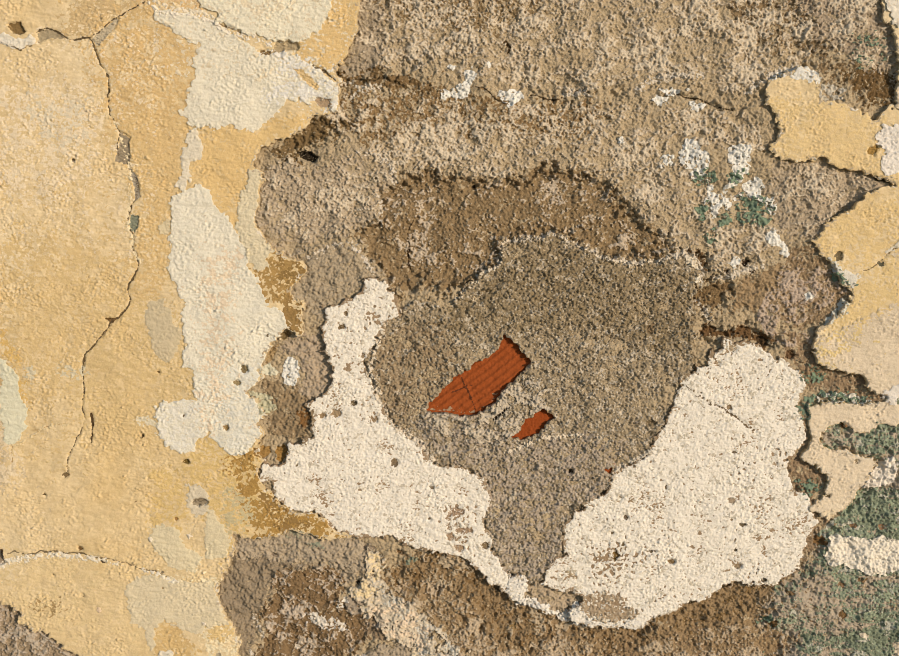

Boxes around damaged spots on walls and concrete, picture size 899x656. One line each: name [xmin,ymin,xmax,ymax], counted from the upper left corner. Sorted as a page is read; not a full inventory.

spalling [0,605,79,656]
crack [7,0,148,472]
crack [7,550,167,577]
spalling [218,0,899,656]